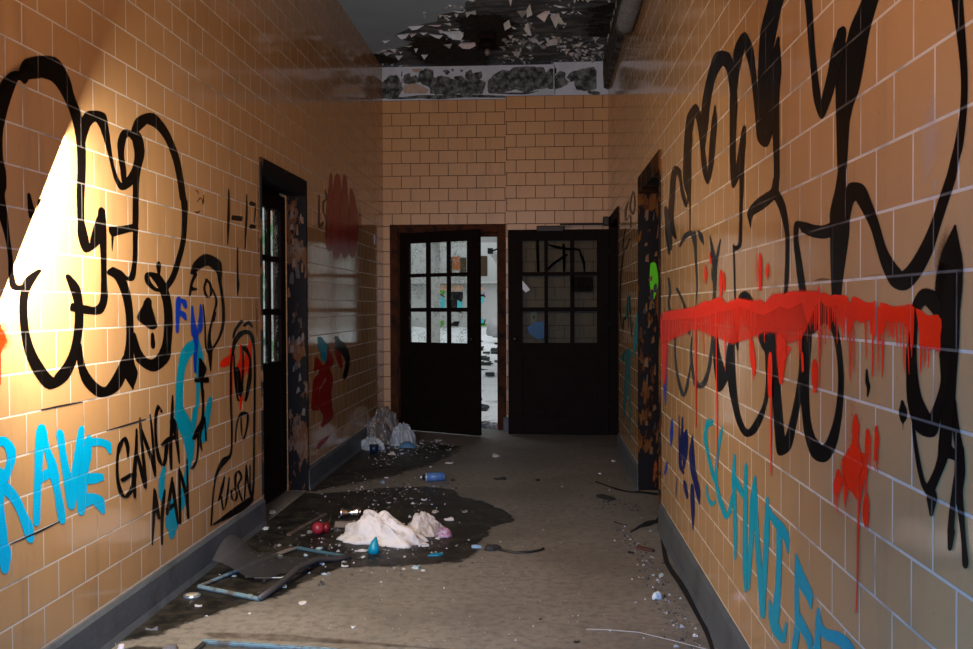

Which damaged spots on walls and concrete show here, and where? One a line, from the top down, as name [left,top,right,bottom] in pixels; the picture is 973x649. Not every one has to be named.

spalling [377,0,618,93]
peeling [287,209,304,297]
peeling [288,318,304,394]